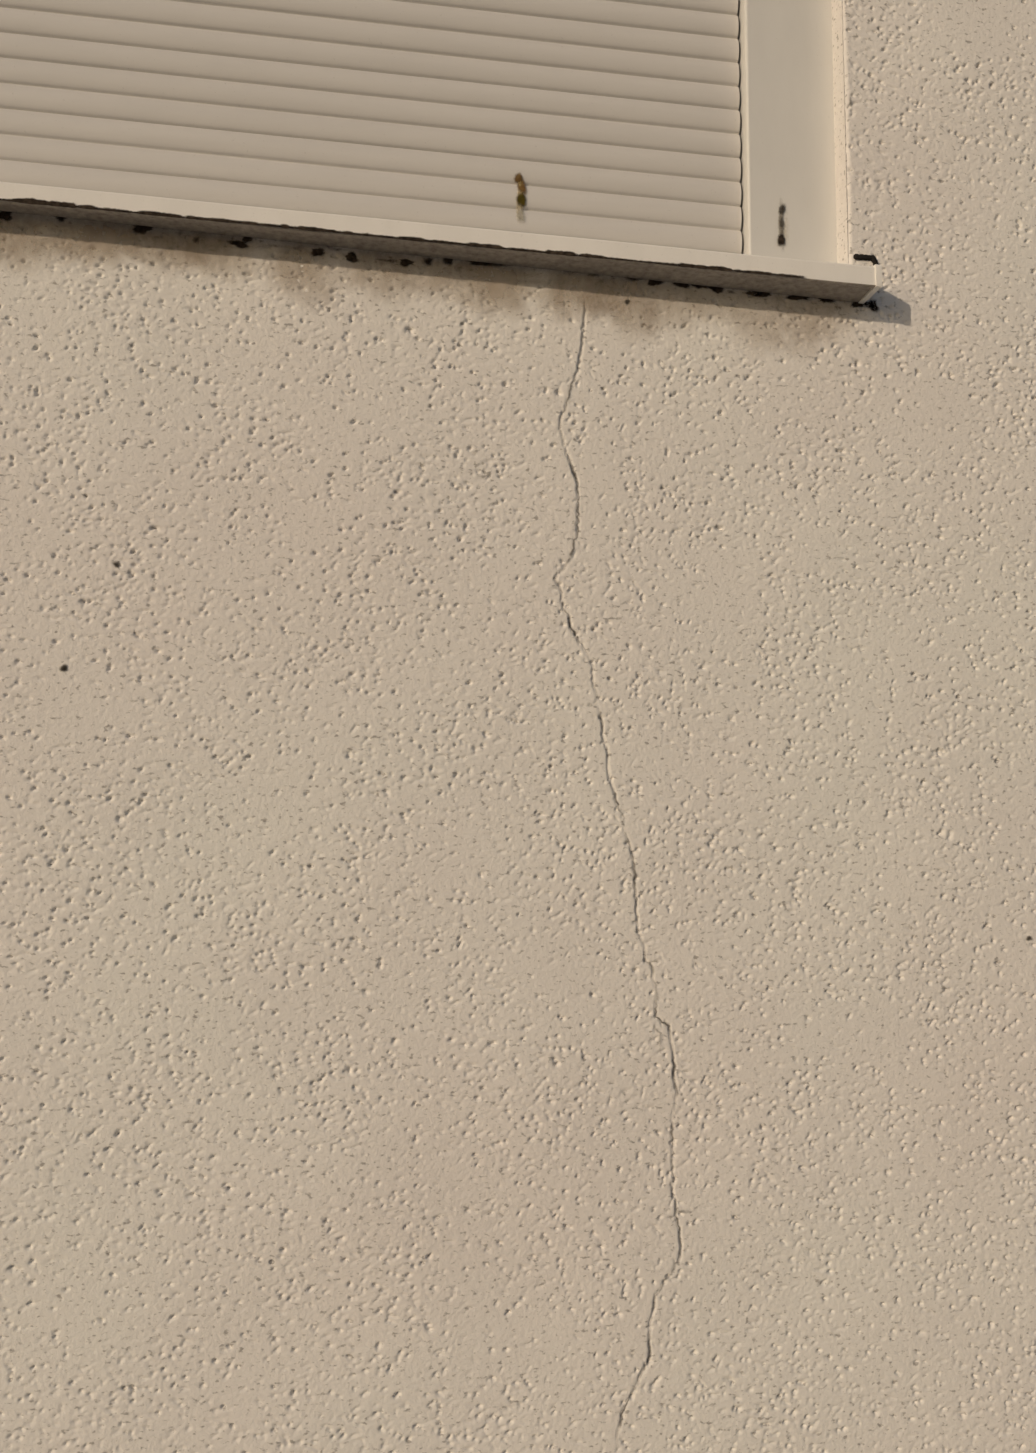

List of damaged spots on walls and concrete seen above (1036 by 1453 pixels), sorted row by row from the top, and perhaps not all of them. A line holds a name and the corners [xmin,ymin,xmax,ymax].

damp [0,198,834,309]
damp [852,300,879,311]
crack [568,456,579,561]
crack [655,1008,678,1162]
crack [619,1337,651,1426]